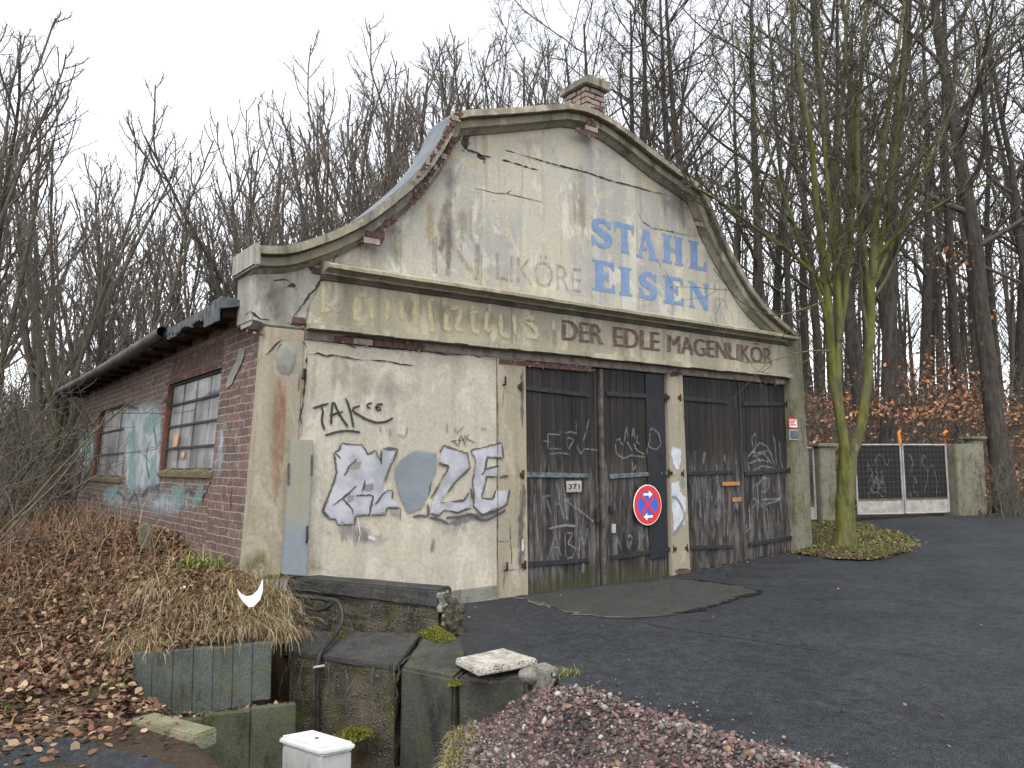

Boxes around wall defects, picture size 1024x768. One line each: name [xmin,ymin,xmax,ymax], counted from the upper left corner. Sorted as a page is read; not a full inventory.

flaking render [361,214,400,246]
flaking render [408,110,486,205]
crack [467,150,686,236]
crack [245,257,516,592]